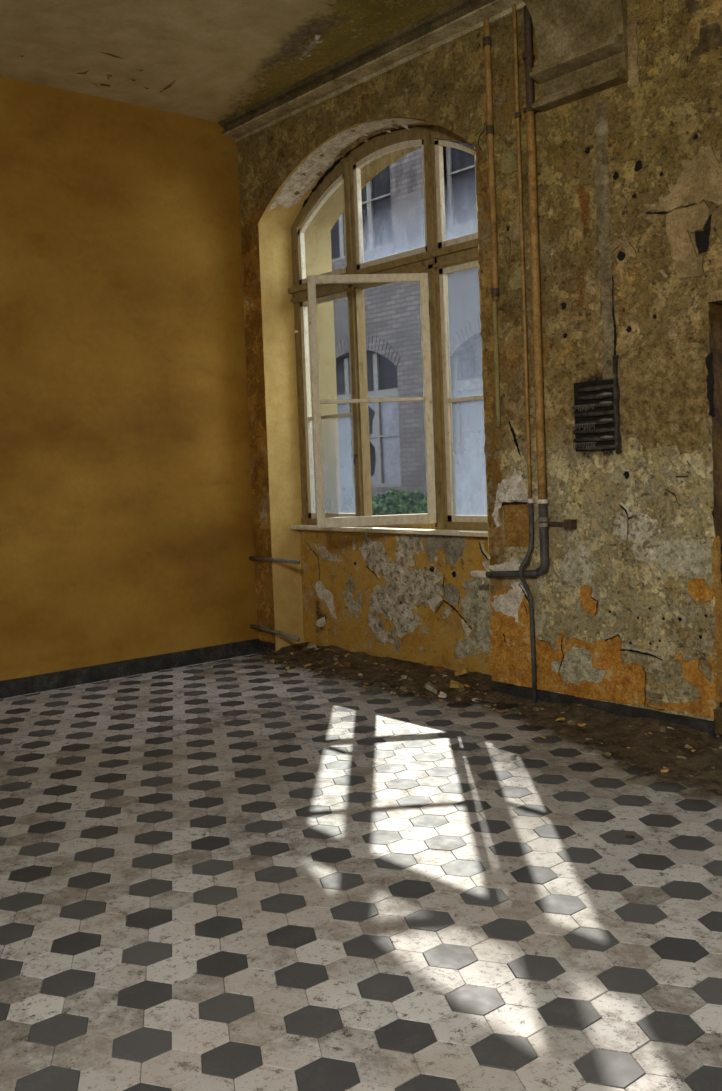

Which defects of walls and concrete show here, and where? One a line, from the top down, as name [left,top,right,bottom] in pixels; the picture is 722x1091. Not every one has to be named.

leakage [226,0,457,117]
peeling [268,118,429,211]
spalling [612,158,646,182]
flaking render [631,132,722,278]
flaking render [492,467,535,527]
peeling [312,510,722,719]